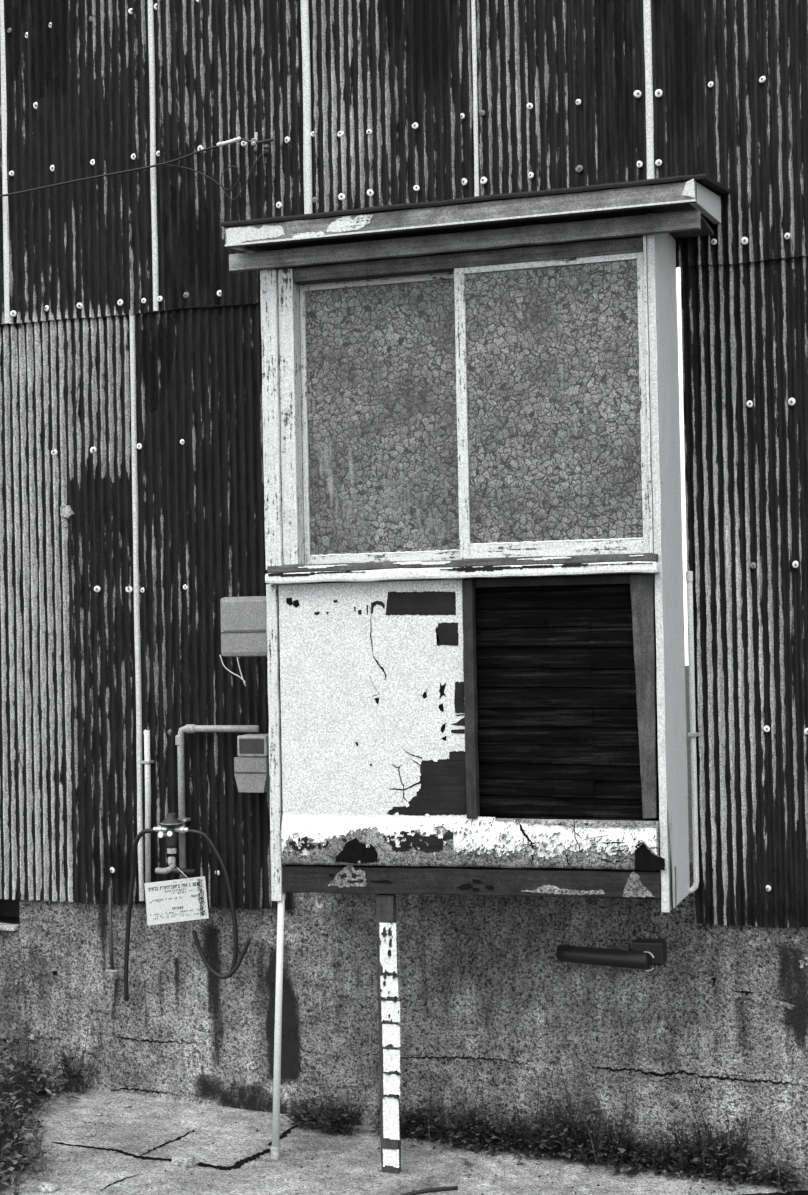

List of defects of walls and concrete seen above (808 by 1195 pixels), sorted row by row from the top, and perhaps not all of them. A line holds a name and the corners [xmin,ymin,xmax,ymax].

crack [370,604,387,697]
peeling [451,681,465,734]
peeling [281,751,657,865]
crack [591,1066,808,1093]